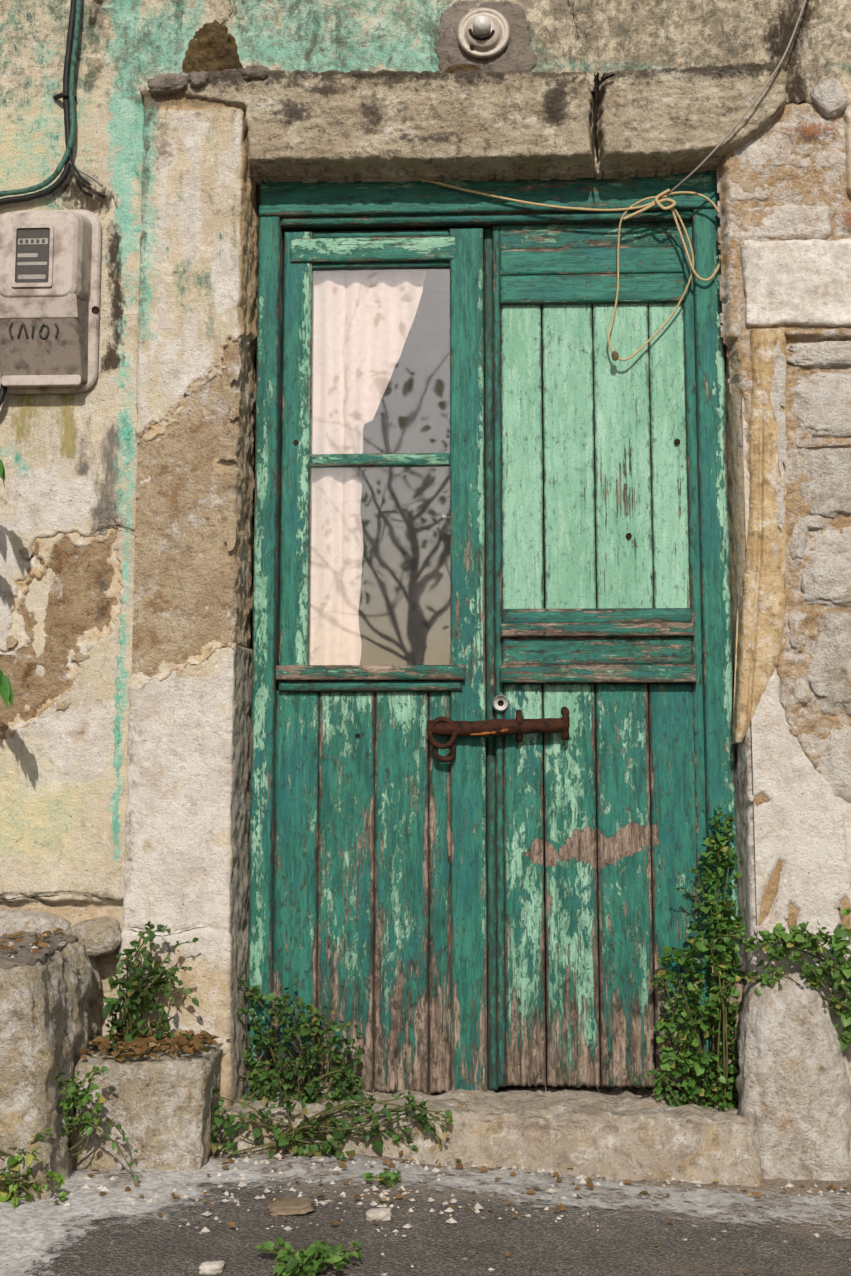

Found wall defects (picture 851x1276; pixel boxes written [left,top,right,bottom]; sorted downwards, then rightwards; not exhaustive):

crack [592,72,615,164]
flaking render [716,77,851,348]
spalling [0,335,255,742]
spalling [745,793,769,807]
spalling [755,861,799,933]
spalling [834,897,851,930]